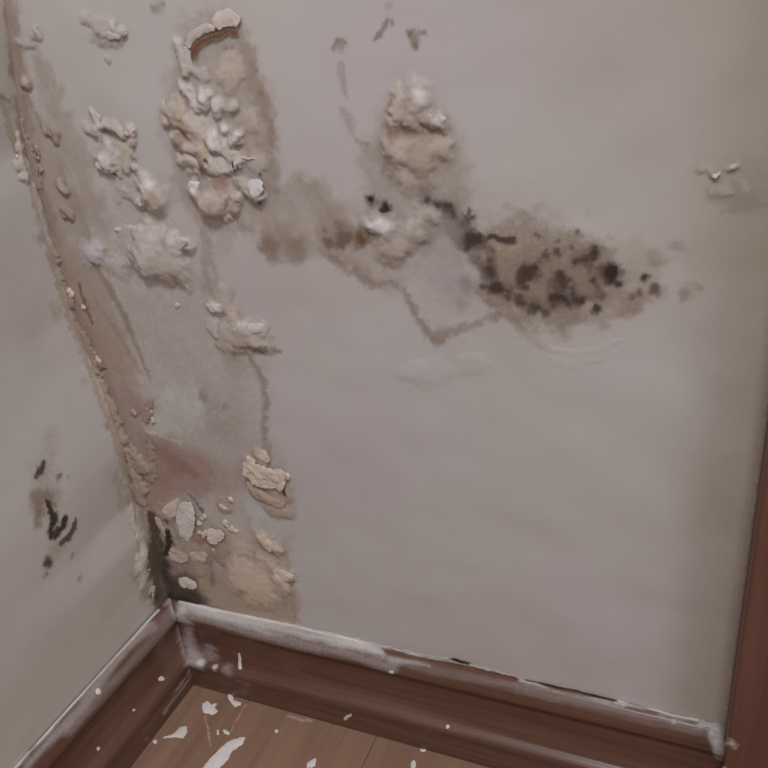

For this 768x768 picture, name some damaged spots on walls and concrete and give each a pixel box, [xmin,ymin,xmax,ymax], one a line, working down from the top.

flaking render [13,119,44,193]
peeling [82,108,137,179]
damp [0,0,297,623]
peeling [159,8,267,222]
peeling [362,205,440,263]
damp [167,25,663,345]
peeling [53,250,294,604]